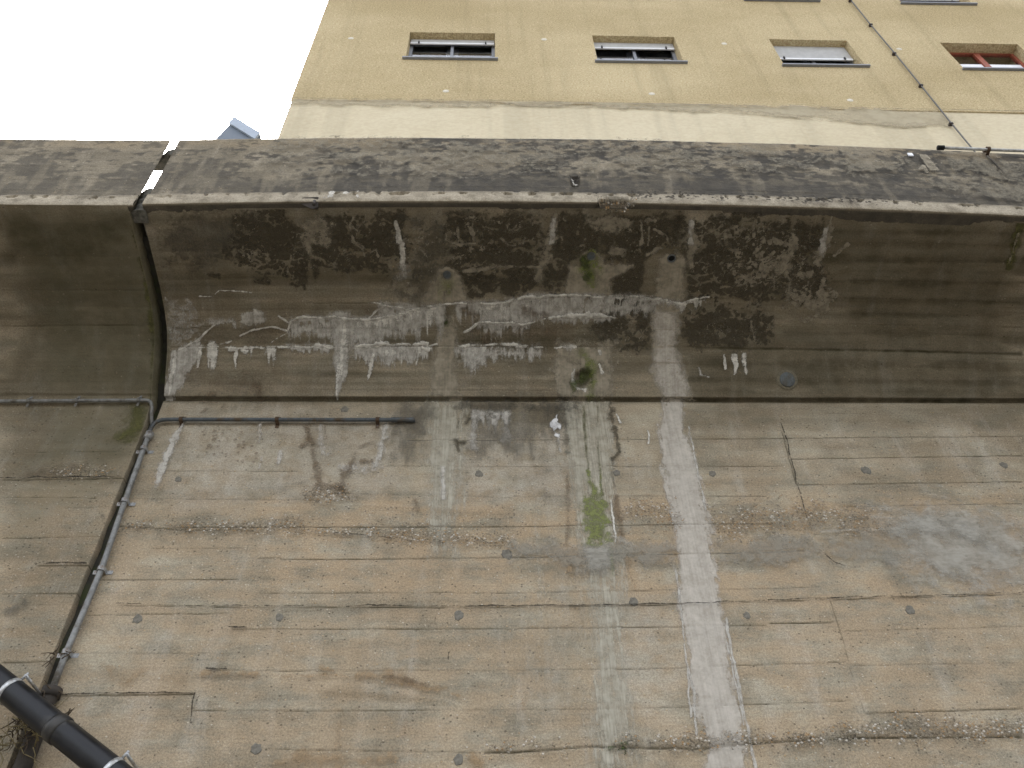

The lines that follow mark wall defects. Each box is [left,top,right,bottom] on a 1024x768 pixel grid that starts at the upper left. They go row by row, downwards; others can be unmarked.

leakage [155,421,186,484]
leakage [164,213,757,768]
crack [781,424,811,525]